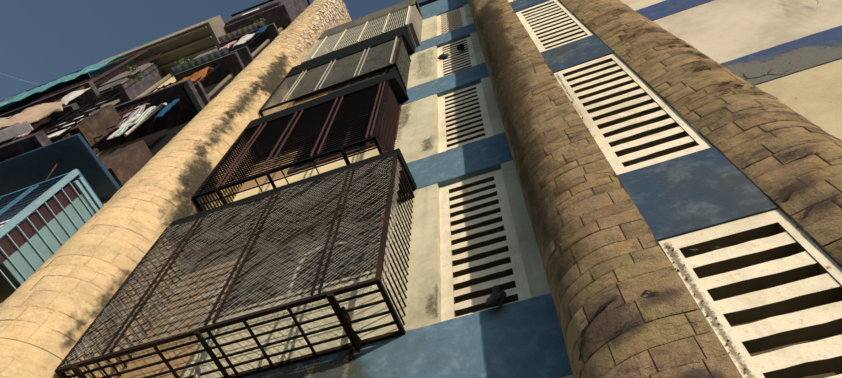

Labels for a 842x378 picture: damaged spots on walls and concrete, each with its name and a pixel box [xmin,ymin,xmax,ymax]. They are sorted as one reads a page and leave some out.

damp [165,53,287,227]